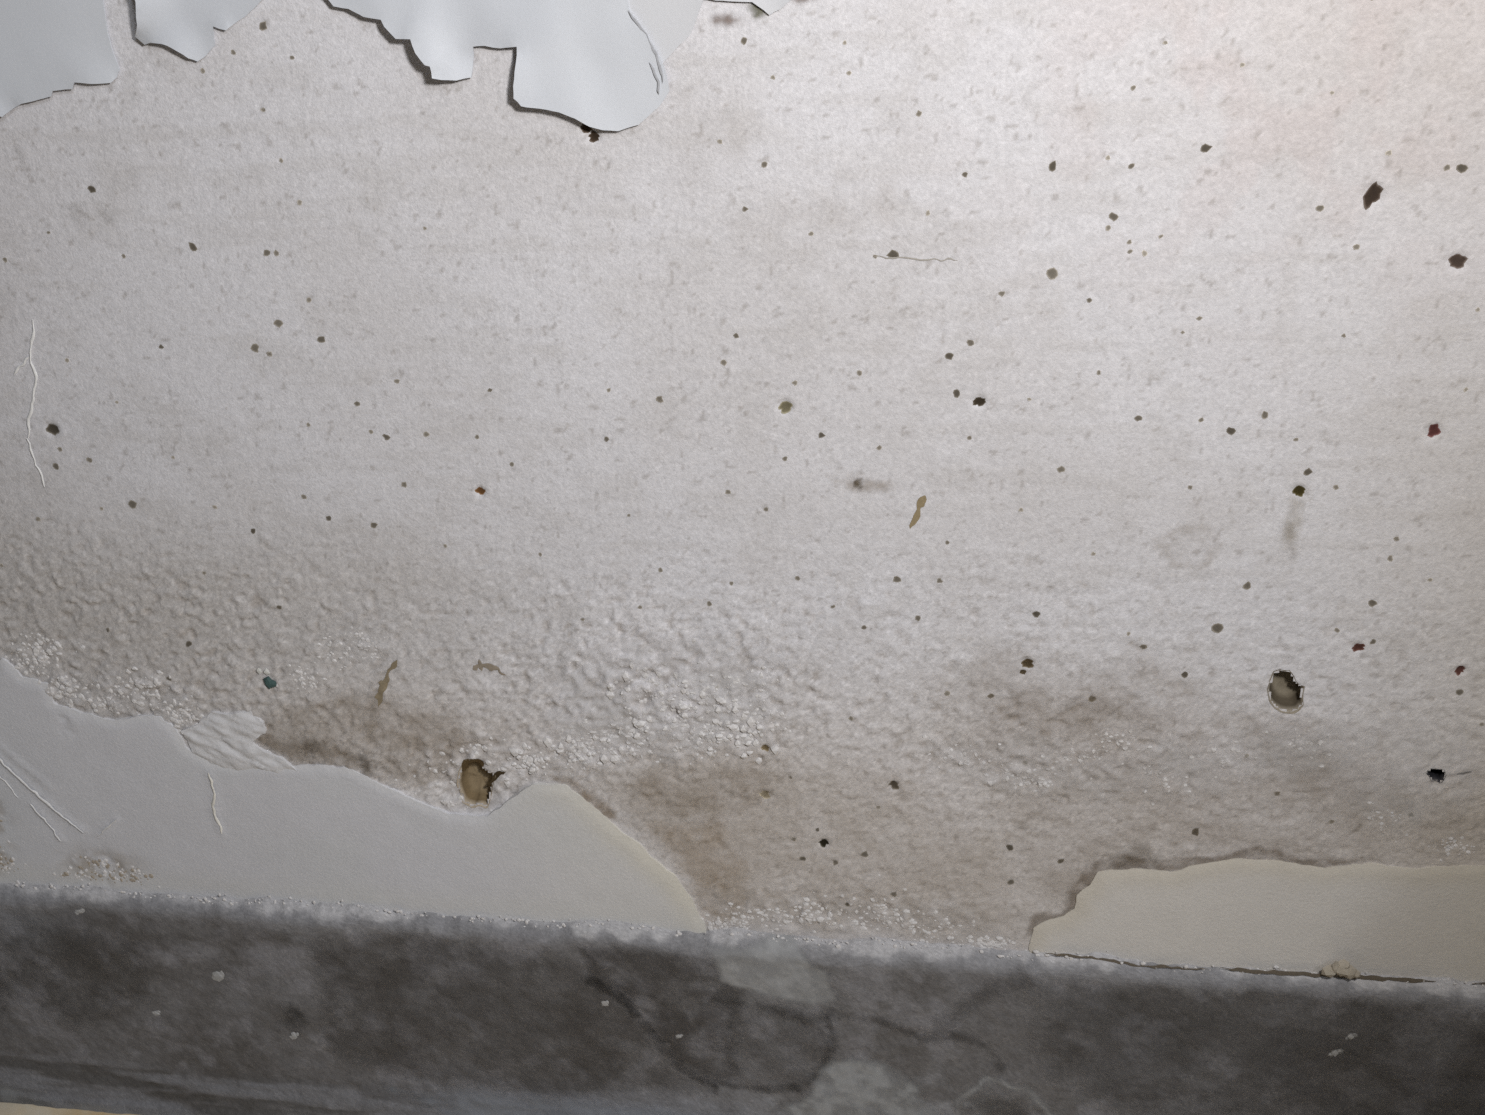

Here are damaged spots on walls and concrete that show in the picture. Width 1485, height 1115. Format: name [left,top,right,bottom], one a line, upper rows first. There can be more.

peeling [0,0,120,117]
peeling [135,0,267,73]
peeling [329,0,790,142]
water stain [276,626,395,693]
peeling [0,658,707,933]
water stain [511,648,791,779]
water stain [922,721,1335,806]
water stain [702,888,1027,1004]
peeling [1029,858,1485,982]
water stain [787,1061,932,1115]